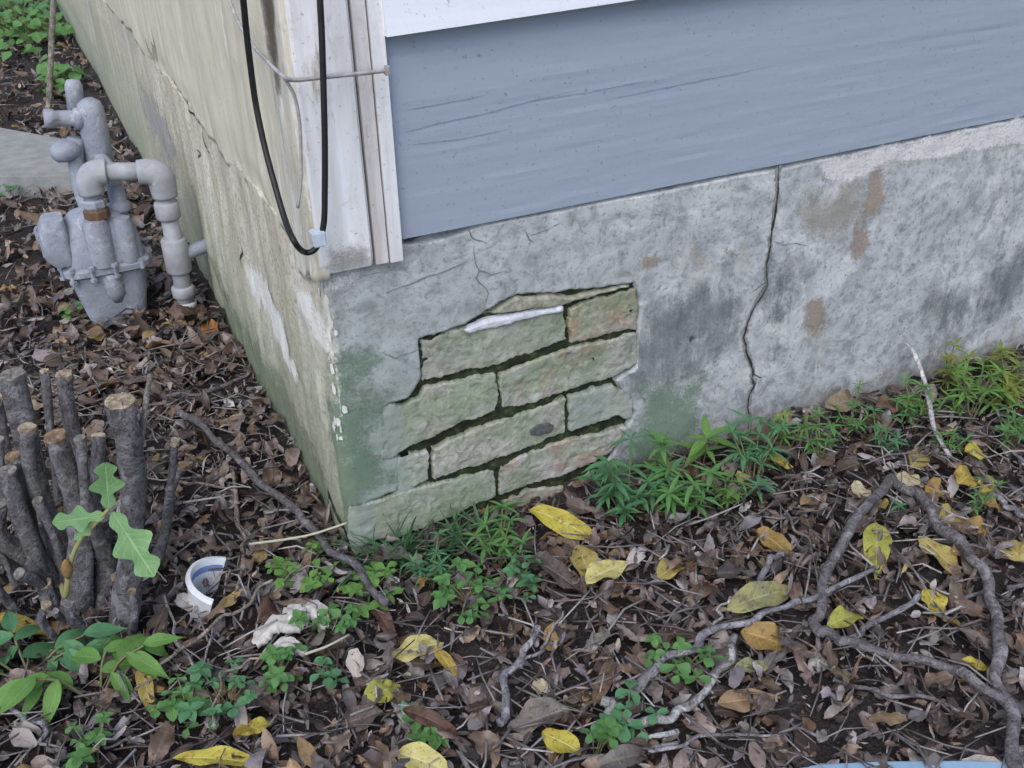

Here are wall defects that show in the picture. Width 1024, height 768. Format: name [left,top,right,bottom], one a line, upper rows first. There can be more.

crack [468,229,501,310]
flaking render [347,282,638,548]
crack [740,165,807,430]